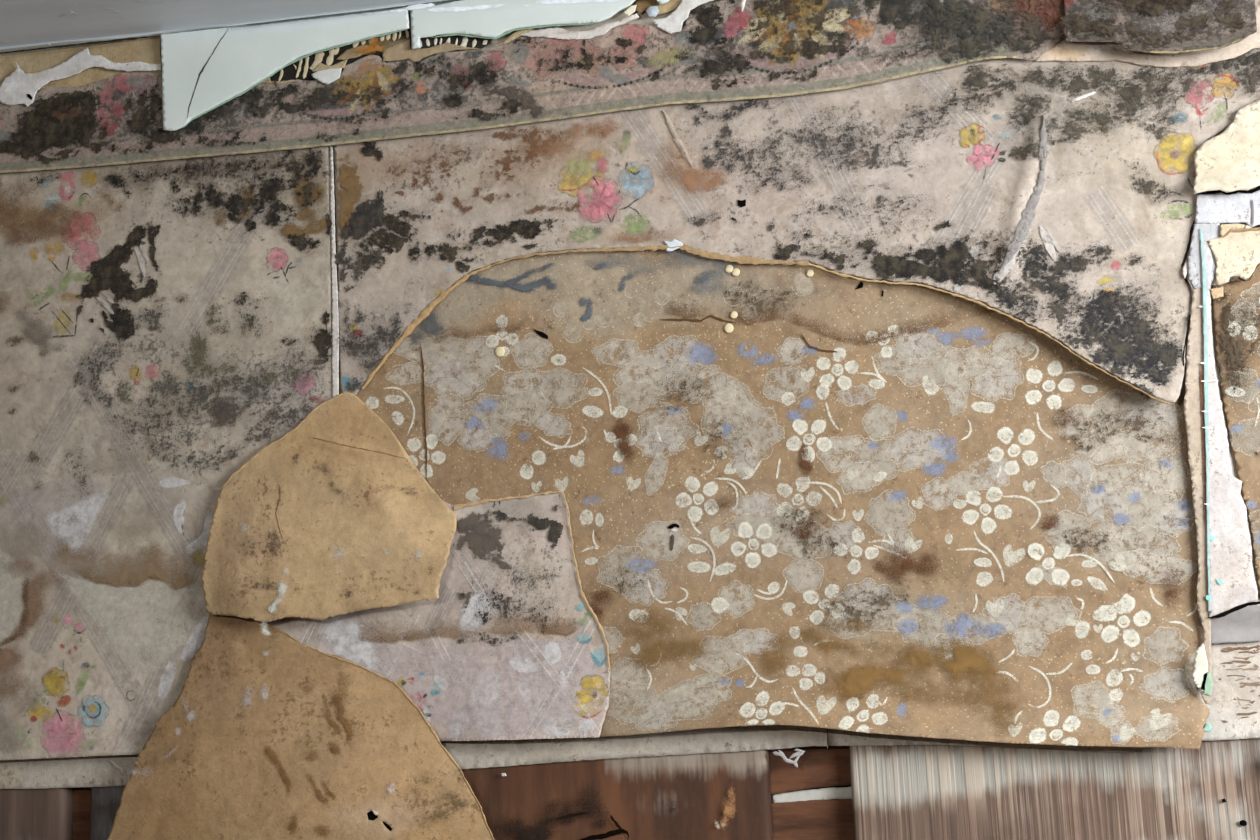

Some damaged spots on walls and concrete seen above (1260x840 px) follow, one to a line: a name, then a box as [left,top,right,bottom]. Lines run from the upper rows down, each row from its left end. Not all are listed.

peeling [311,68,342,84]
damp [0,30,652,502]
damp [579,0,1260,467]
damp [0,501,204,751]
damp [358,490,579,647]
damp [797,438,816,479]
damp [764,502,853,562]
damp [1039,511,1119,557]